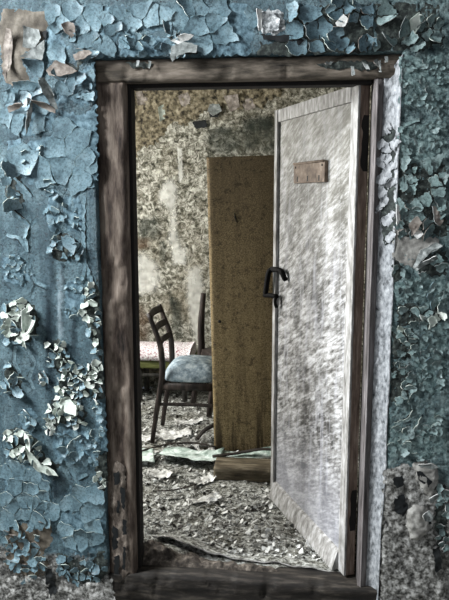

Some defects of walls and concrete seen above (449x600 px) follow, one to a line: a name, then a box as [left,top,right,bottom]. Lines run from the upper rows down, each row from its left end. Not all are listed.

peeling [0,0,449,406]
peeling [0,275,127,600]
crack [68,468,88,486]
flaking render [379,404,449,600]